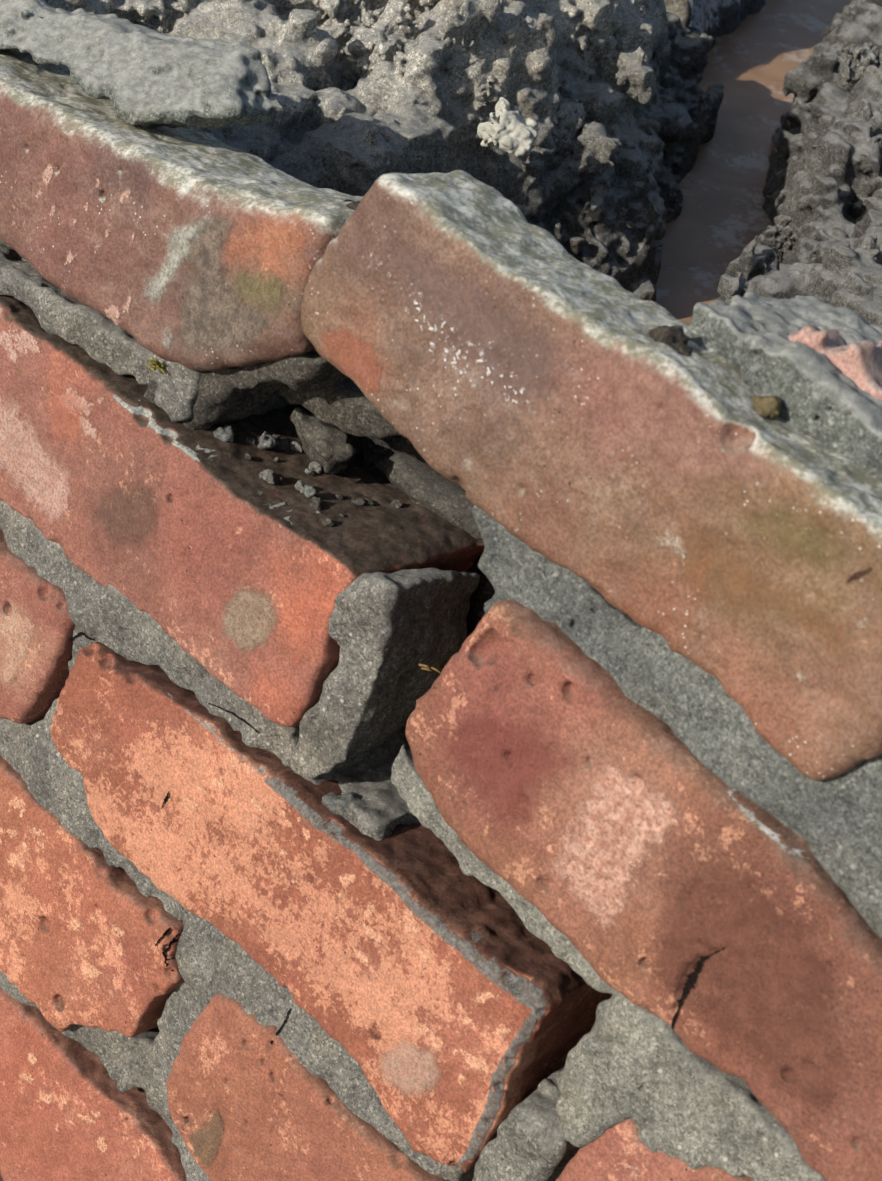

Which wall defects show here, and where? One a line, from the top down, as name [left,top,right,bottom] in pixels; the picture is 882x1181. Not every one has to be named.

crack [155,919,182,974]
crack [671,947,725,1030]